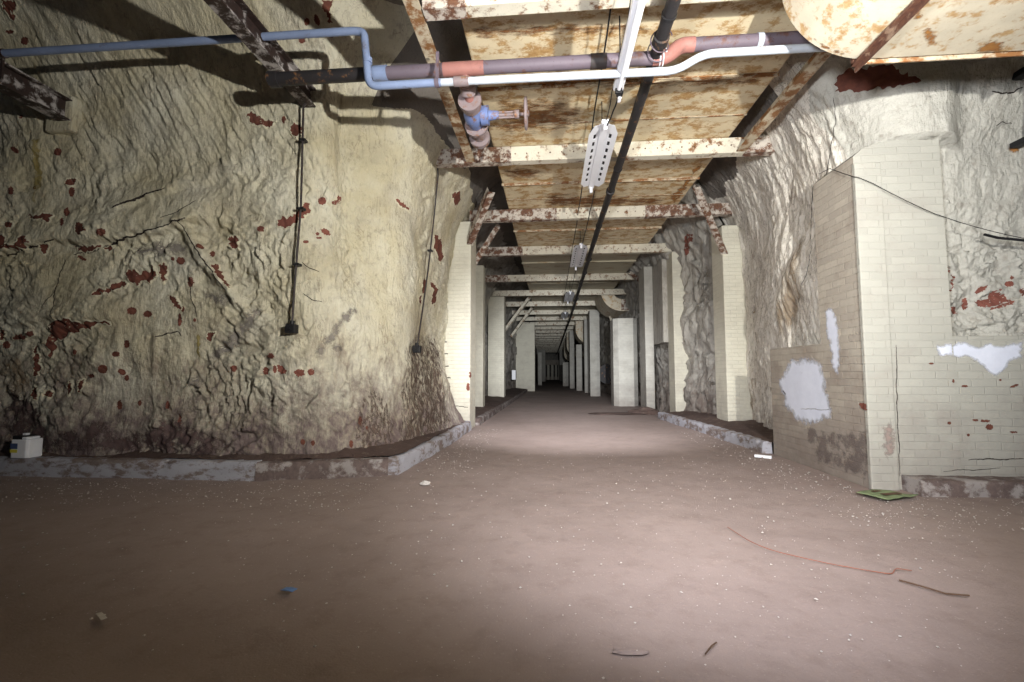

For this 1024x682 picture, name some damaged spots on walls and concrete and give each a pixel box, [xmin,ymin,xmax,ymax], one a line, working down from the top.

corrosion [474,24,626,38]
corrosion [916,11,935,44]
corrosion [978,42,1004,52]
corrosion [529,78,629,87]
corrosion [652,75,756,85]
corrosion [499,101,579,132]
crack [111,188,164,208]
corrosion [507,168,538,178]
corrosion [546,166,700,206]
crack [0,201,225,337]
water stain [356,335,450,448]
water stain [808,429,867,475]